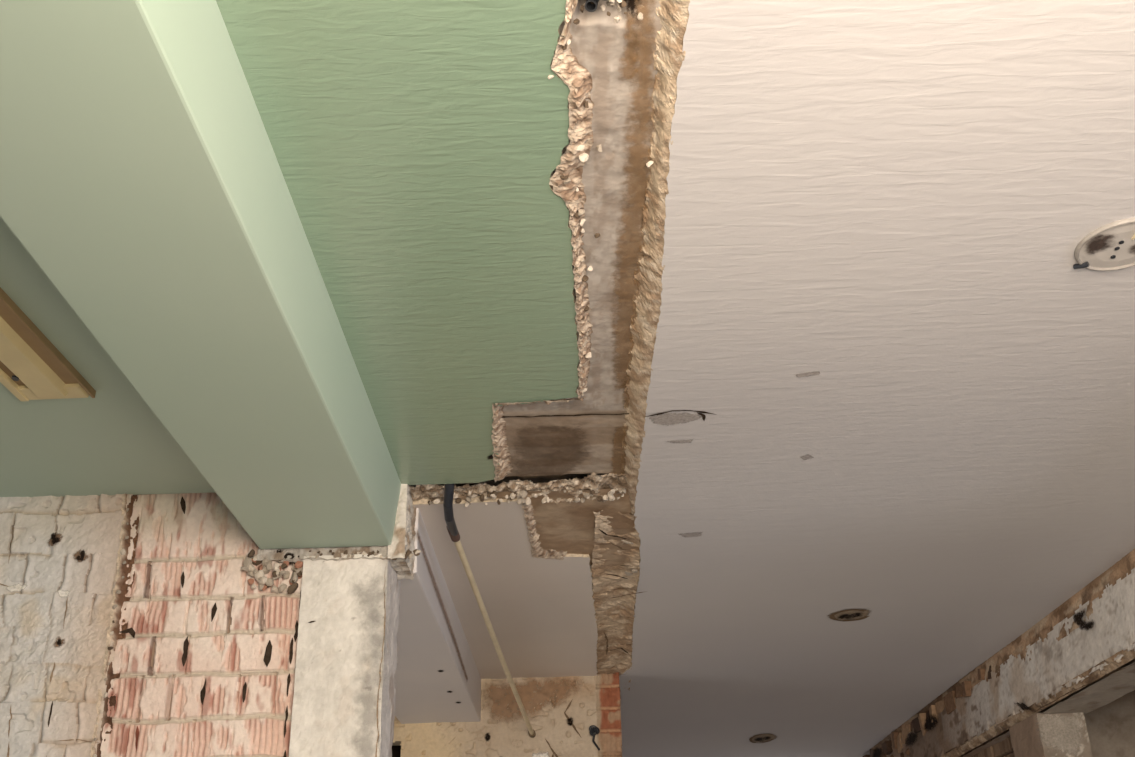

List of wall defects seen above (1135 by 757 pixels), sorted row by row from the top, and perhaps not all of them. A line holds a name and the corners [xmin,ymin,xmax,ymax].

spalling [491,0,690,691]
peeling [309,550,379,559]
peeling [392,549,421,560]
spalling [263,640,272,667]
spalling [862,549,1135,757]
crack [5,707,13,757]
crack [46,662,98,757]